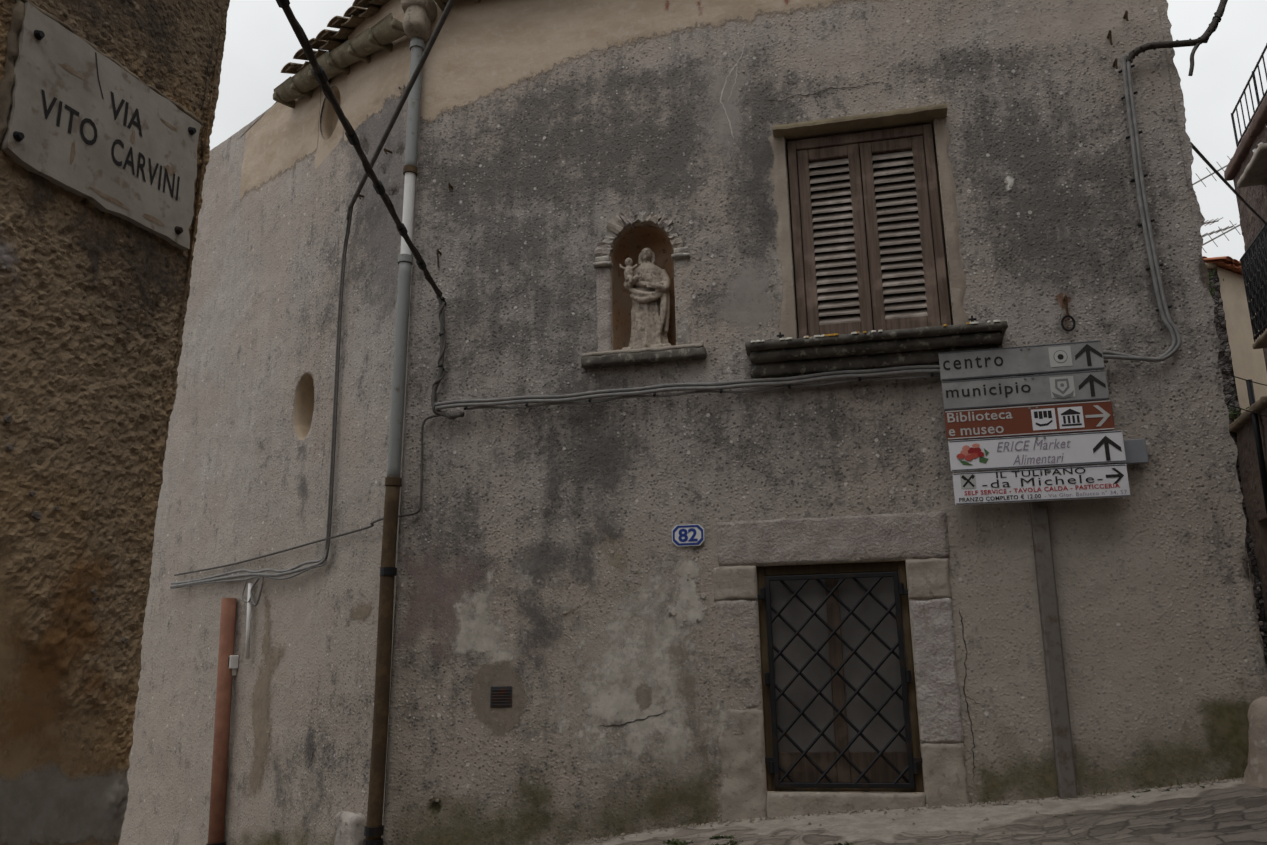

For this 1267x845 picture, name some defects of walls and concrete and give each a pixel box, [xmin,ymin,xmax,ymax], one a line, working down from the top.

crack [720,38,745,138]
crack [764,82,879,108]